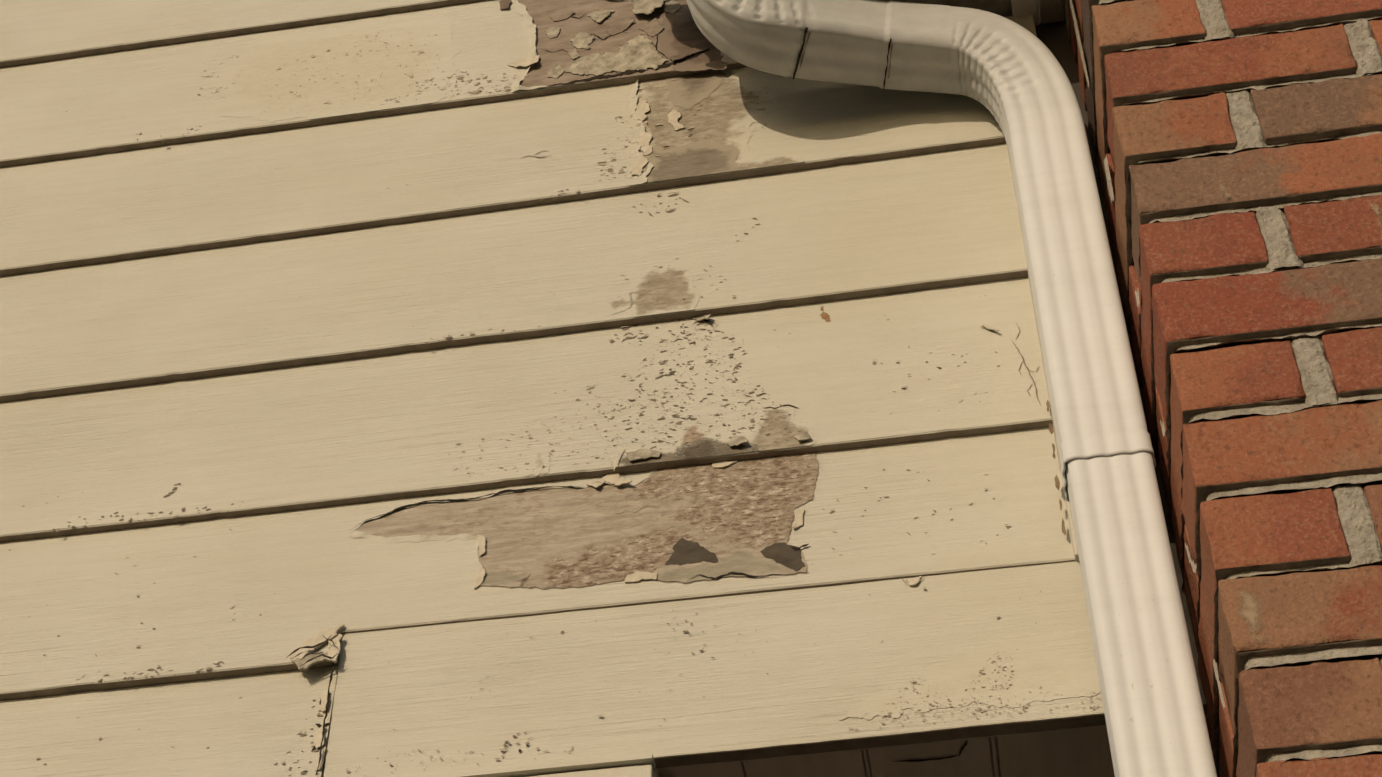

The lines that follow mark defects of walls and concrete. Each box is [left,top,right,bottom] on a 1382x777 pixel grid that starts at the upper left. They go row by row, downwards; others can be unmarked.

peeling [266,0,805,216]
peeling [839,83,856,157]
peeling [346,258,838,597]
peeling [290,624,345,671]